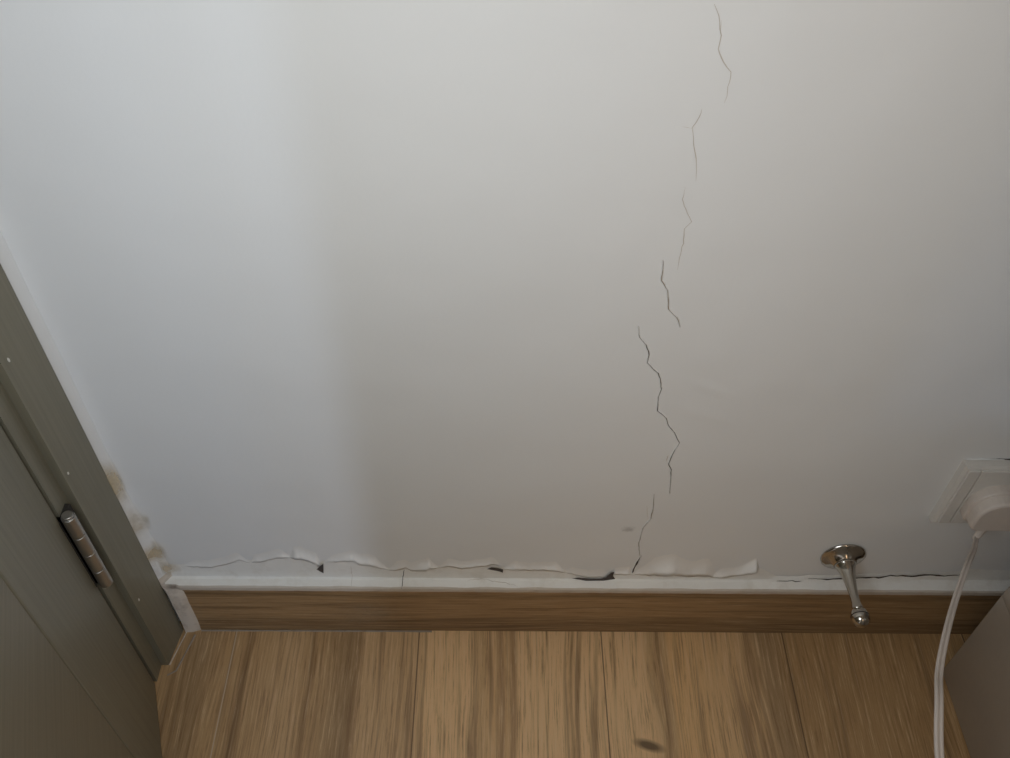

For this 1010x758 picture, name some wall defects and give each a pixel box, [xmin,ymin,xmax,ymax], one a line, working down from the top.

crack [660,4,731,327]
peeling [185,546,615,581]
crack [631,326,680,575]